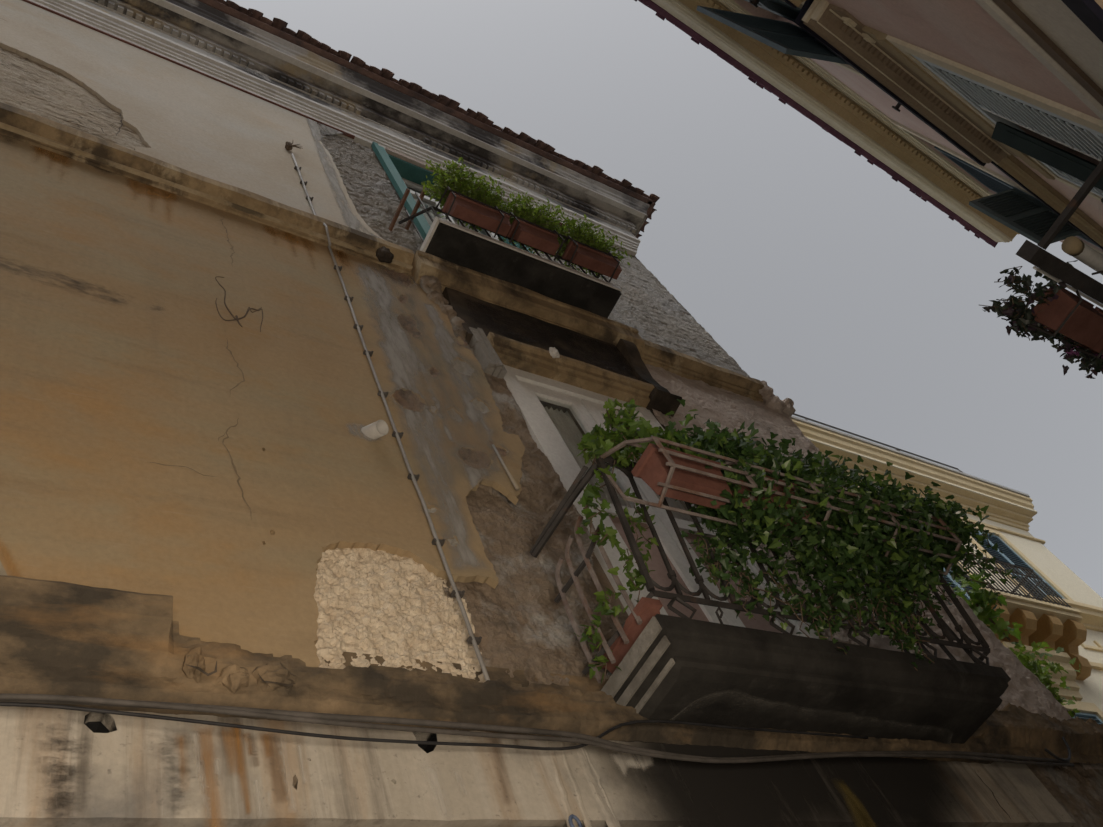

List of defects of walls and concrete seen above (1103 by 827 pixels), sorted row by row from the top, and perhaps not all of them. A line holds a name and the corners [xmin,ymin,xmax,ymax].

spalling [0,47,146,150]
crack [150,418,252,519]
spalling [313,345,622,686]